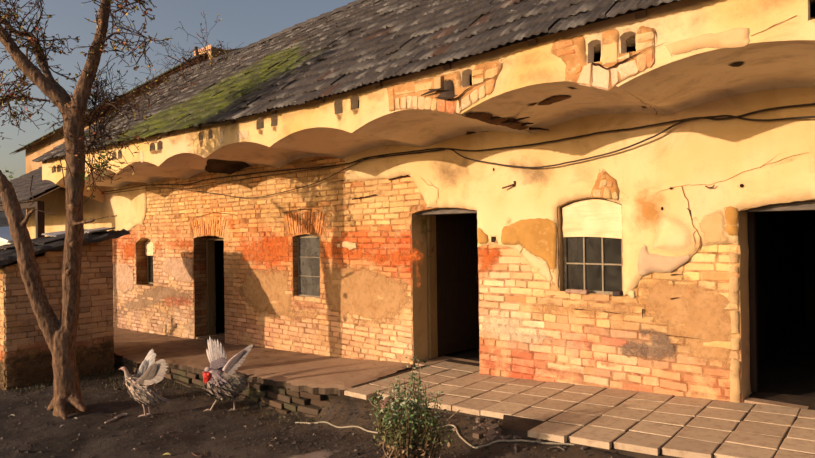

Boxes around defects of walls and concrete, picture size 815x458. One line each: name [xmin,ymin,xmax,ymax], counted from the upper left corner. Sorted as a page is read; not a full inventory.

flaking render [388,59,549,132]
flaking render [528,26,655,106]
flaking render [591,171,619,200]
crack [656,153,803,252]
flaking render [113,157,426,364]
flaking render [477,206,740,401]
leakage [621,329,674,360]